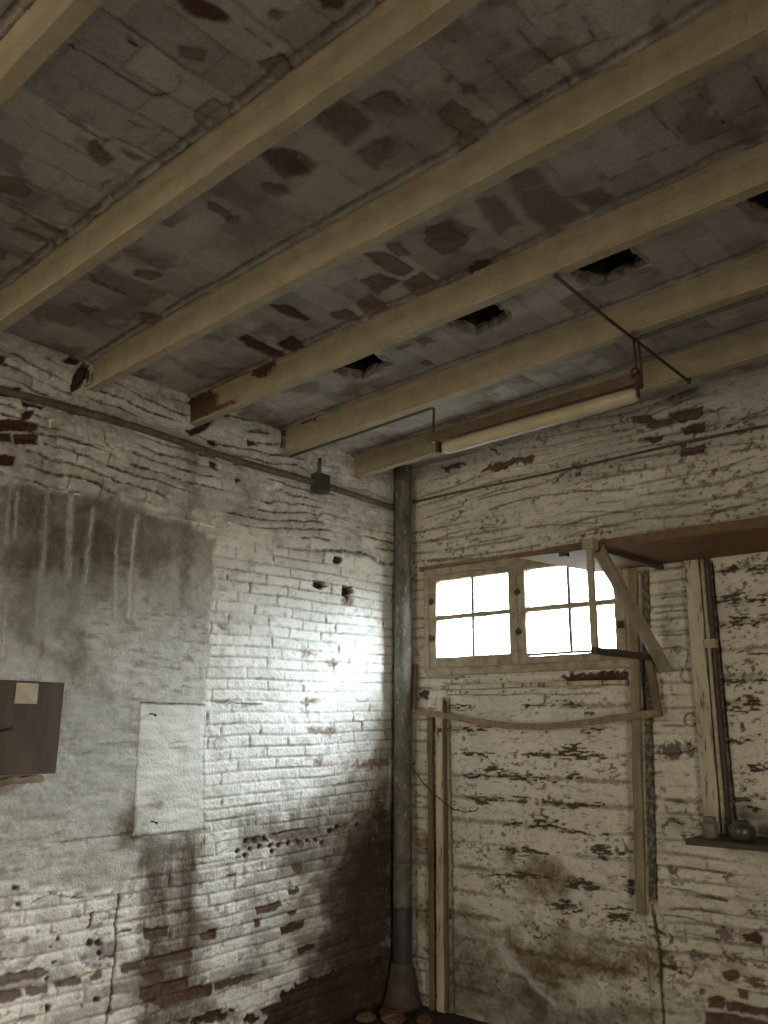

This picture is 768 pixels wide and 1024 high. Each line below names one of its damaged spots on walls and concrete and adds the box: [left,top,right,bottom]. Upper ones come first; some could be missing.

peeling [0,387,43,466]
leakage [64,495,95,584]
leakage [113,516,139,620]
spalling [452,699,608,783]
spalling [466,793,626,860]
peeling [0,961,101,1012]
crack [36,894,132,1020]
leakage [136,841,197,1024]
peeling [120,948,258,1009]
peeling [179,975,327,1024]
leakage [265,754,394,1024]
peeling [668,927,768,1024]